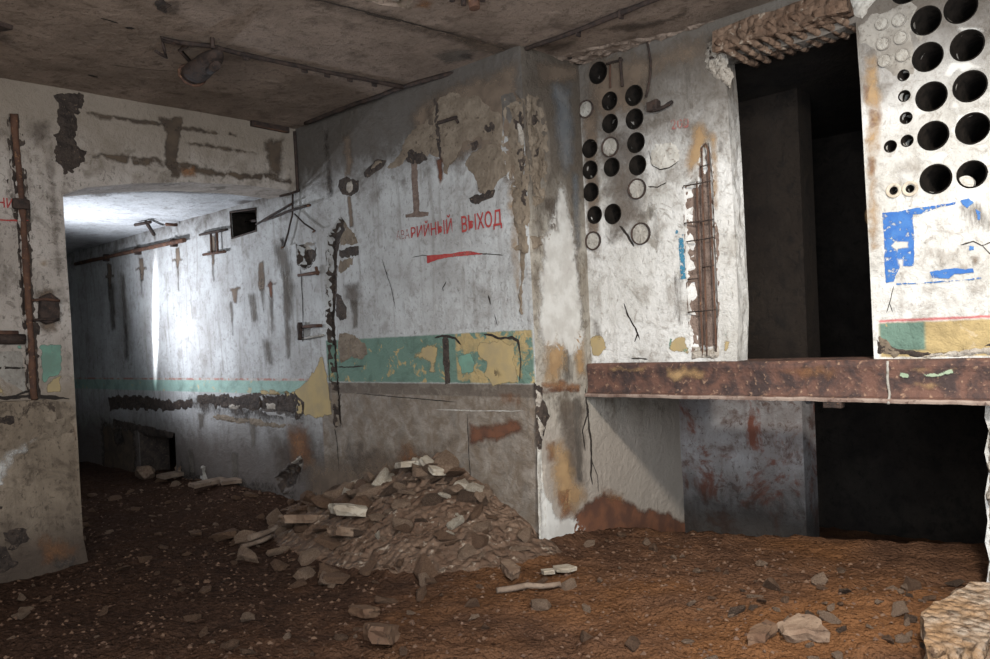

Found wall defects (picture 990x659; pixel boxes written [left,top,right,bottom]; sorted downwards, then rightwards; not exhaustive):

spalling [705,41,734,88]
spalling [53,93,87,174]
spalling [669,143,729,360]
peeling [108,92,606,540]
peeling [39,345,62,392]
corrosion [670,369,703,379]
spalling [0,415,74,485]
corrosion [469,420,522,444]
corrosion [542,380,685,532]
spalling [0,528,30,573]